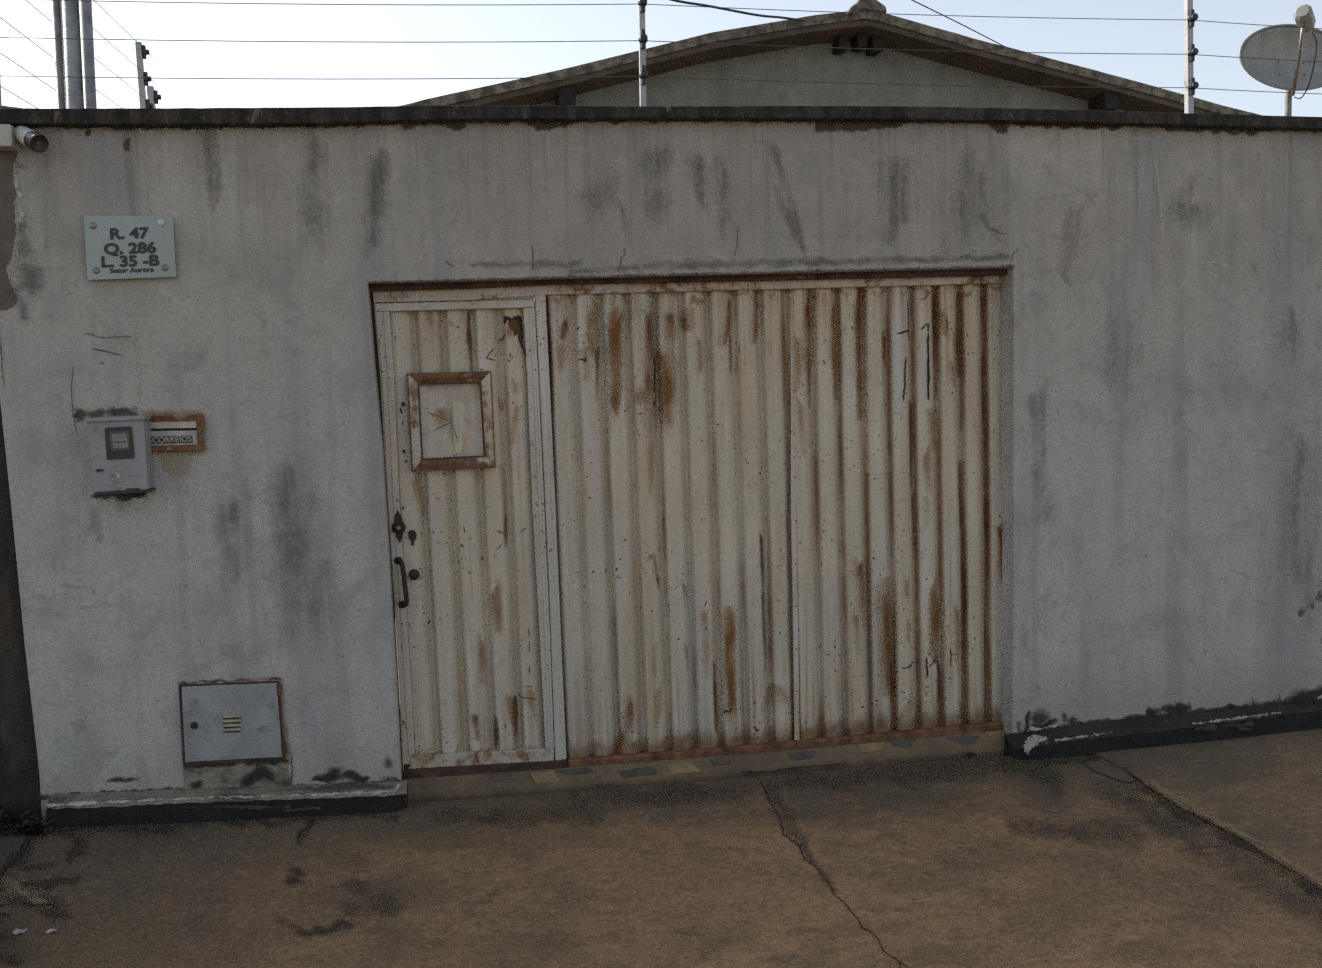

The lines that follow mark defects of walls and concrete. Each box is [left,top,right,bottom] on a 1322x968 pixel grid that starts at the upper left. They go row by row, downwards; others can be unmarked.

damp [254,121,672,131]
damp [749,121,959,132]
damp [982,123,1317,136]
flaking render [0,151,36,318]
rust [546,306,567,418]
rust [956,288,999,372]
rust [957,463,967,661]
rust [984,482,1002,577]
peeling [1023,723,1105,755]
damp [1018,688,1322,733]
peeling [1193,712,1281,731]
crack [742,760,901,968]